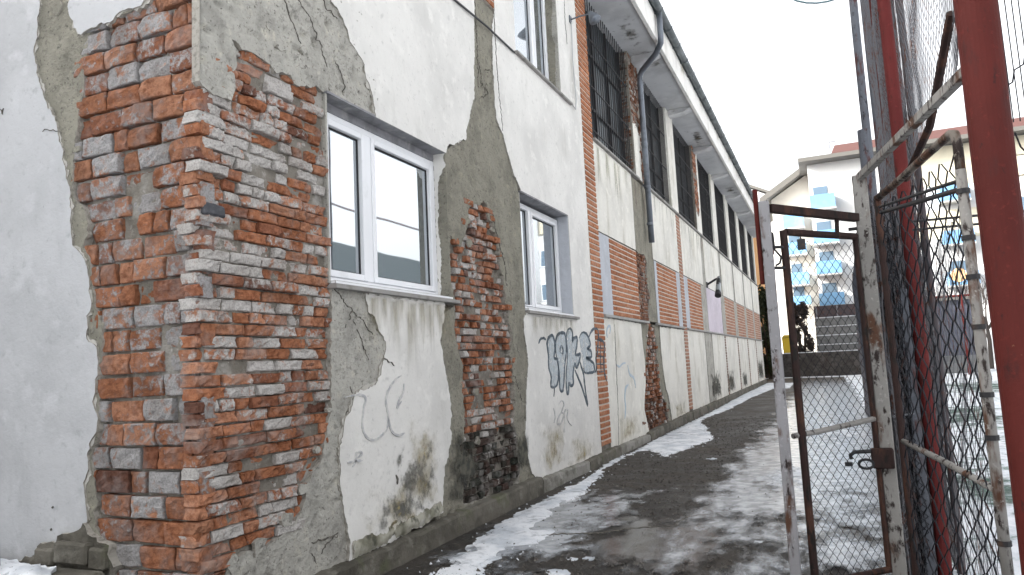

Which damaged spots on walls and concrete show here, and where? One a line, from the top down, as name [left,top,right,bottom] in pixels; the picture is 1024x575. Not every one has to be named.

spalling [19,0,385,575]
crack [284,0,346,93]
spalling [431,0,534,521]
crack [474,1,503,131]
spalling [619,53,671,435]
leakage [381,446,434,527]